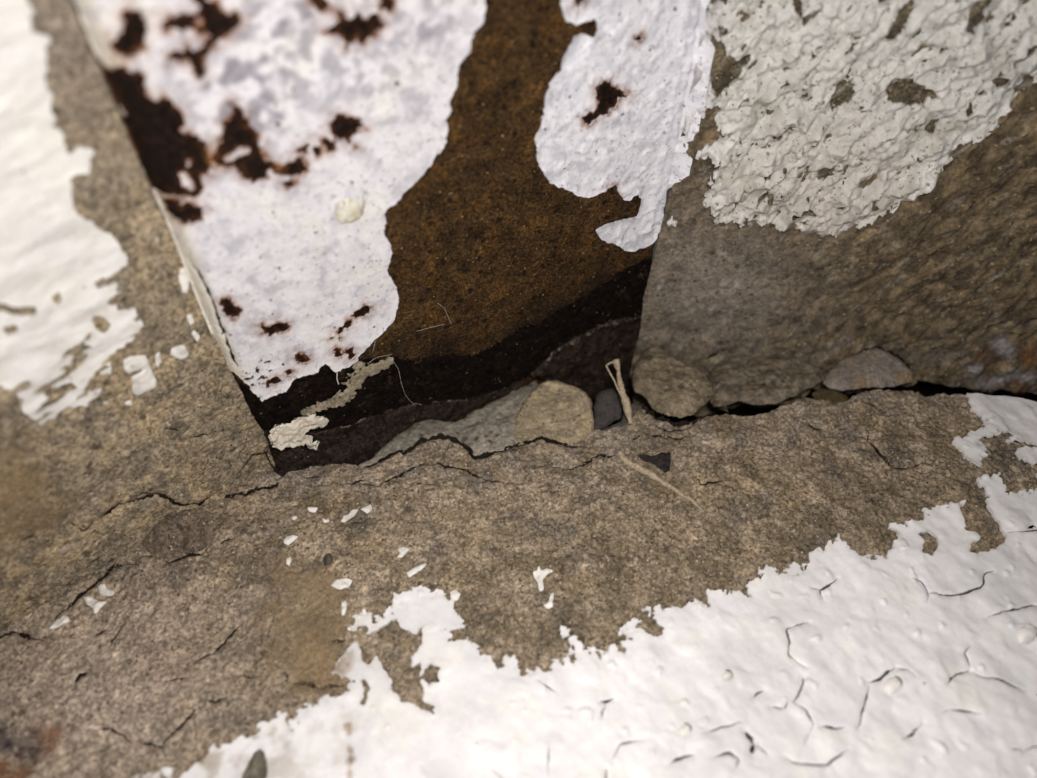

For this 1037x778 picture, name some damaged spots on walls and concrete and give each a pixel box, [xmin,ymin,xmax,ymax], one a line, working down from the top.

rust [97,0,367,225]
peeling [710,26,757,97]
peeling [878,0,947,73]
peeling [0,0,275,632]
rust [219,296,243,321]
rust [231,0,655,477]
peeling [630,72,1037,417]
crack [347,346,1037,486]
crack [71,451,279,531]
crack [0,535,239,641]
peeling [0,381,1037,778]
crack [672,623,916,769]